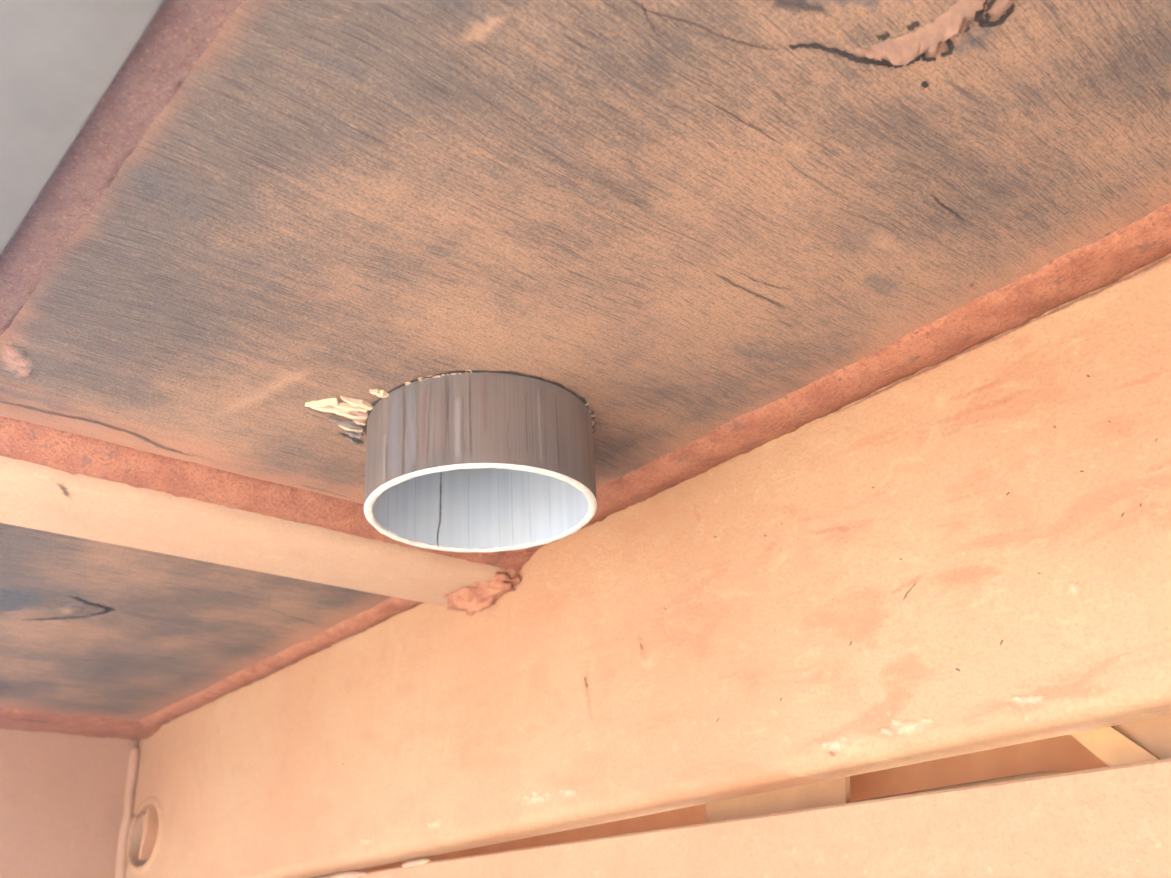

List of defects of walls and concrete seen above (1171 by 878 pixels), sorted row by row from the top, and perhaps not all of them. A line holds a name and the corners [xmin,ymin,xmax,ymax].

leakage [763,0,910,17]
peeling [985,0,1014,21]
leakage [0,588,52,615]